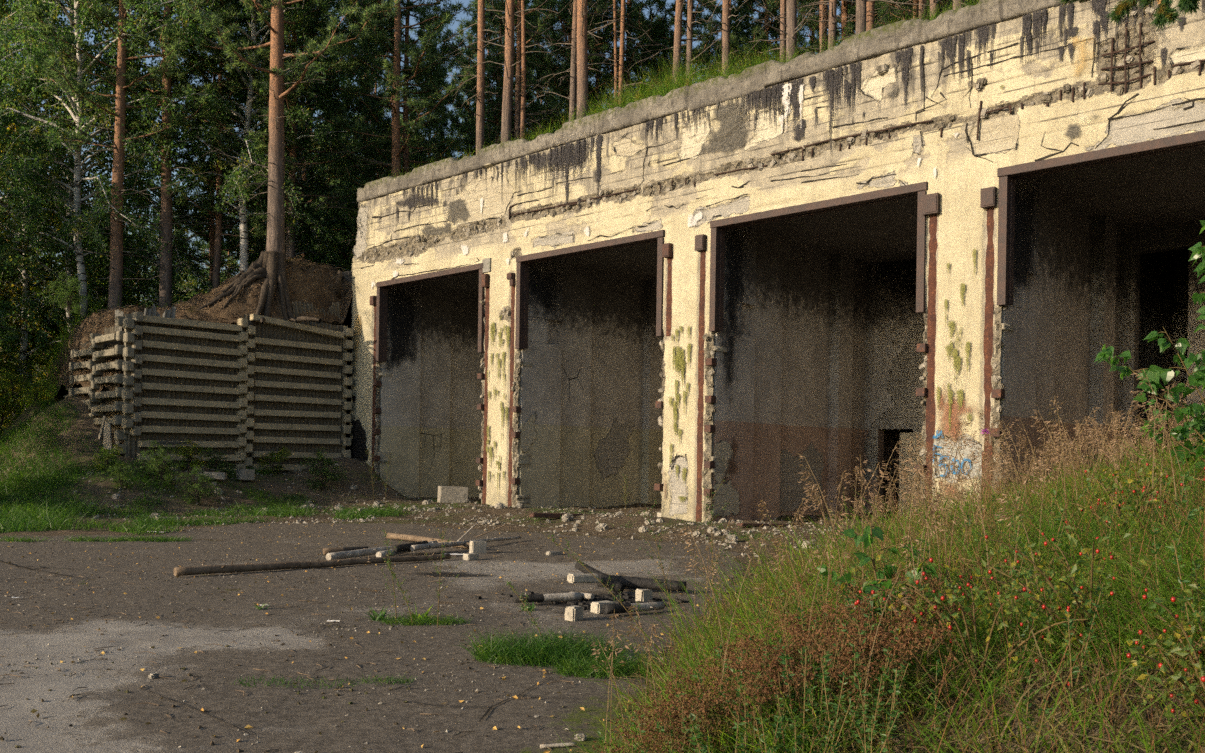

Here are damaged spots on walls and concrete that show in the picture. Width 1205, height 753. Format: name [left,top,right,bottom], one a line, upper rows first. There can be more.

leakage [888,45,923,107]
leakage [938,23,995,81]
crack [803,30,1205,162]
leakage [1020,3,1077,68]
leakage [1091,0,1167,67]
spalling [352,4,1205,264]
leakage [1064,124,1081,139]
leakage [396,135,602,236]
leakage [688,211,703,227]
crack [588,140,893,241]
leakage [669,326,691,502]